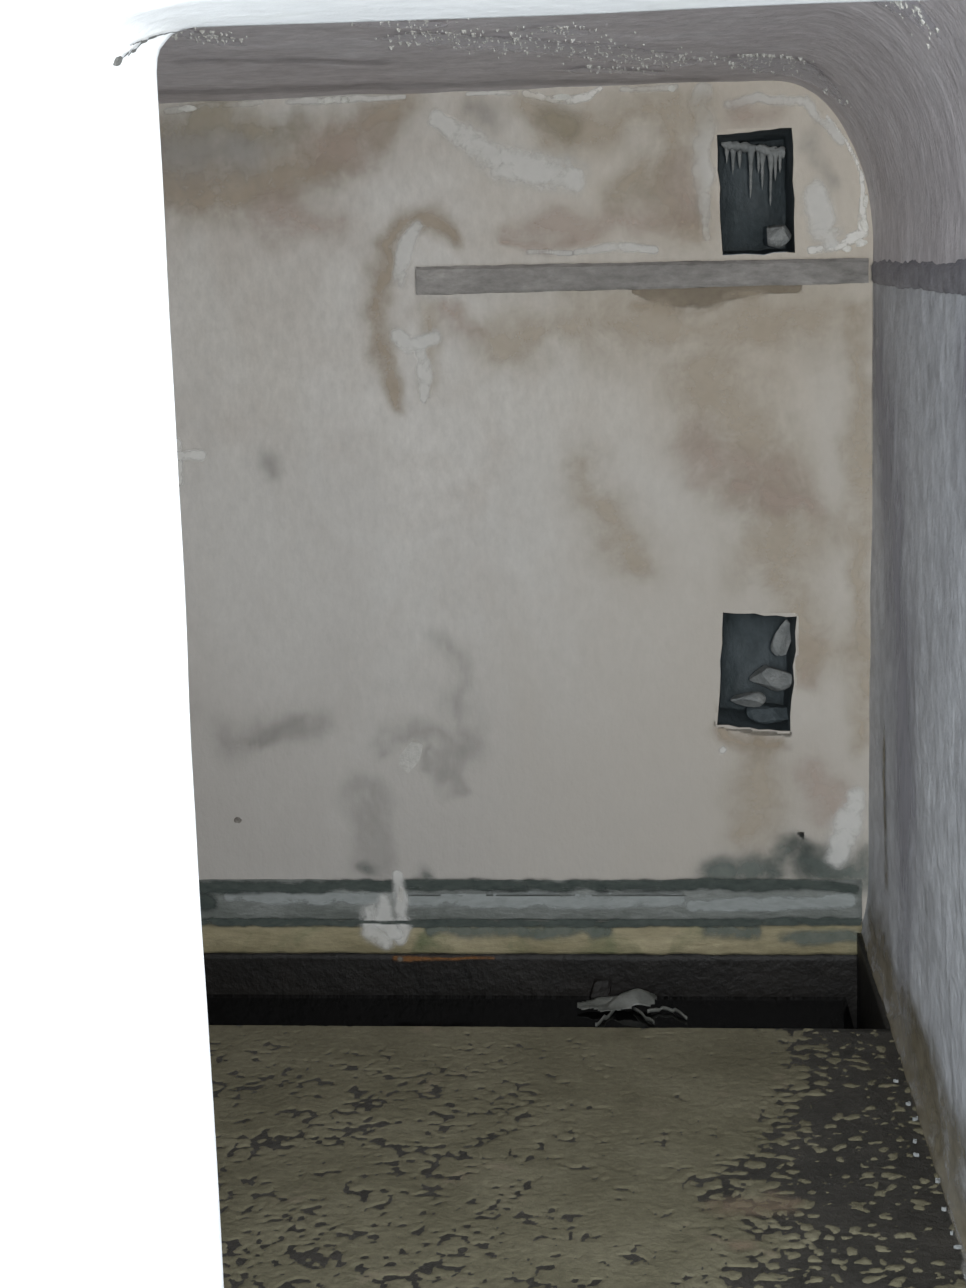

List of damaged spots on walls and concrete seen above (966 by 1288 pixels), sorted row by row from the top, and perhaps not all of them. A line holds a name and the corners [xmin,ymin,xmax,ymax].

water stain [160,103,400,208]
water stain [430,111,583,191]
water stain [466,86,608,142]
water stain [620,83,714,241]
water stain [725,93,869,254]
water stain [372,213,458,318]
water stain [632,285,802,313]
water stain [375,330,440,407]
water stain [873,322,911,883]
water stain [363,870,409,948]